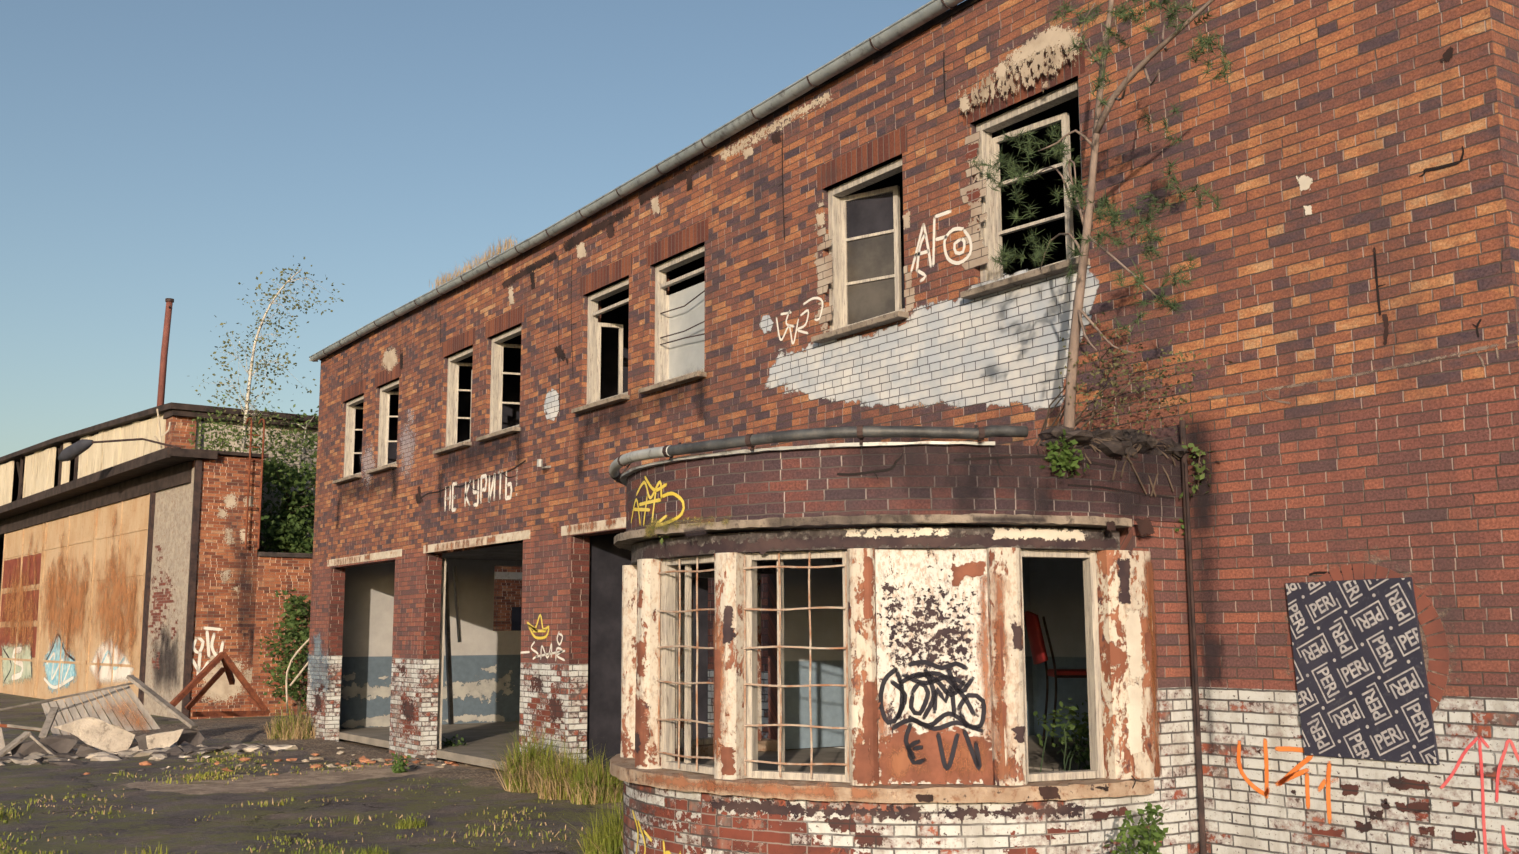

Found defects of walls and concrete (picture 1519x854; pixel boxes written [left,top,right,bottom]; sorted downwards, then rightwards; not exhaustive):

spalling [954,21,1082,117]
spalling [959,131,988,270]
peeling [844,527,952,539]
peeling [992,527,1085,542]
corrosion [2,538,140,688]
spalling [148,545,178,670]
peeling [310,663,423,741]
peeling [443,664,568,748]
peeling [636,641,647,677]
peeling [635,695,650,768]
peeling [638,679,1128,854]
peeling [863,556,989,703]